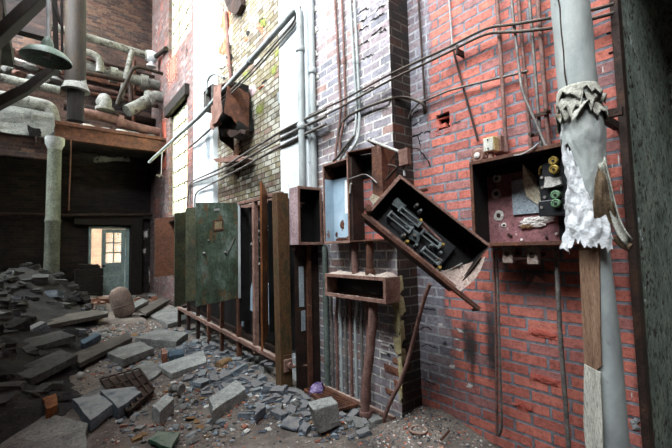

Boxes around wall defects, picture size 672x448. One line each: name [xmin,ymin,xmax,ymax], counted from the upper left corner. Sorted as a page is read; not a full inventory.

crack [358,5,386,60]
crack [411,109,431,167]
hole [434,113,460,136]